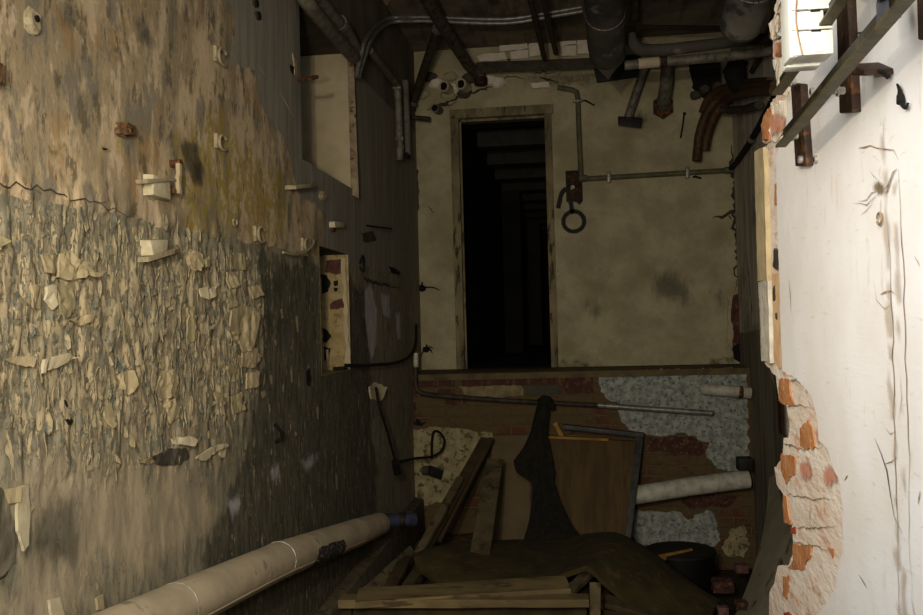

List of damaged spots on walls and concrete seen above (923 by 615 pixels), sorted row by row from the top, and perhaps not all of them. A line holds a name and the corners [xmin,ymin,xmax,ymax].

crack [0,181,140,218]
peeling [0,199,293,485]
flaking render [321,258,351,370]
peeling [412,368,750,506]
flaking render [726,294,740,362]
flaking render [754,0,843,599]
crack [860,145,920,615]
peeling [632,493,750,558]